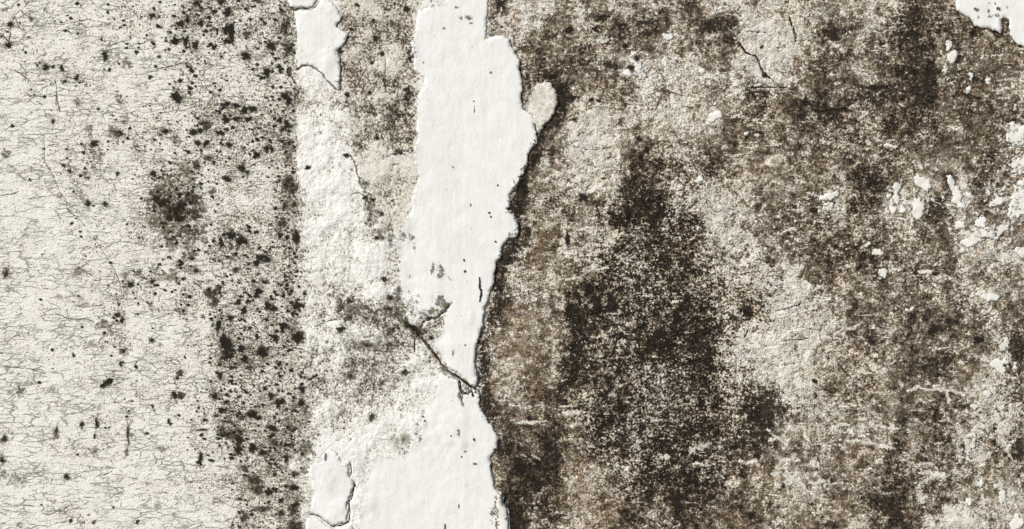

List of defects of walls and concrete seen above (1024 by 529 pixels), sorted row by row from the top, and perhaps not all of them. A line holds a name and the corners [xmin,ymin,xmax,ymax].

peeling [288,0,348,90]
damp [818,15,857,85]
peeling [955,0,1024,47]
damp [797,70,902,121]
damp [0,0,738,529]
peeling [305,0,558,529]
crack [402,302,479,400]
damp [734,264,833,501]
damp [845,438,896,450]
damp [906,361,1024,463]
damp [848,462,949,529]
damp [944,486,1019,529]